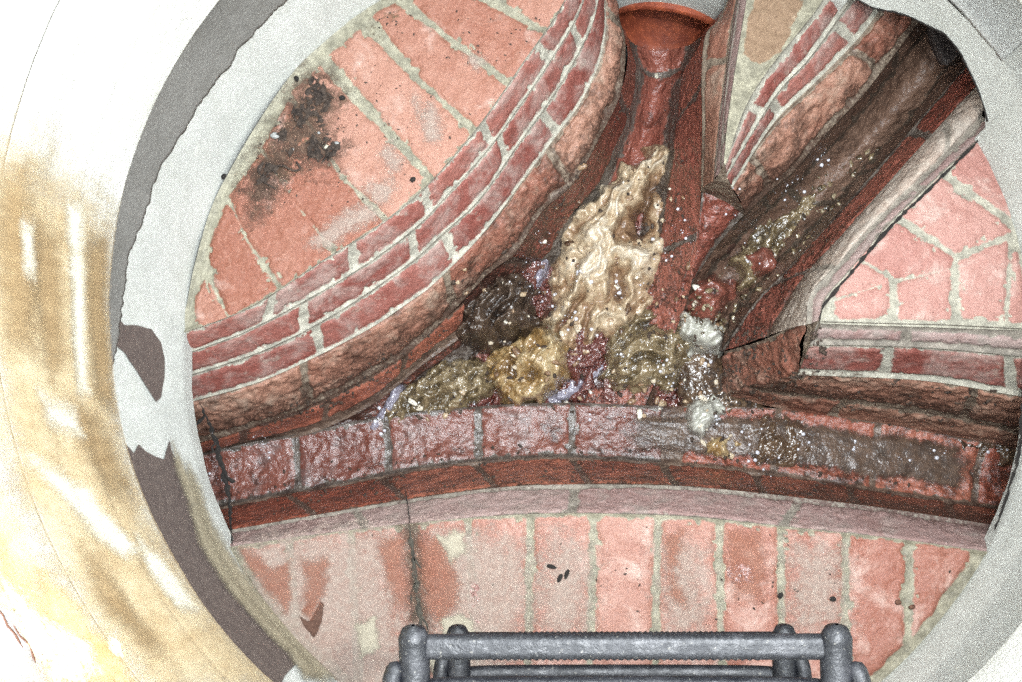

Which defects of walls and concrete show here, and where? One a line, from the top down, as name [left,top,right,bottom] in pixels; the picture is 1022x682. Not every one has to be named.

damp [0,139,333,682]
crack [400,490,433,634]